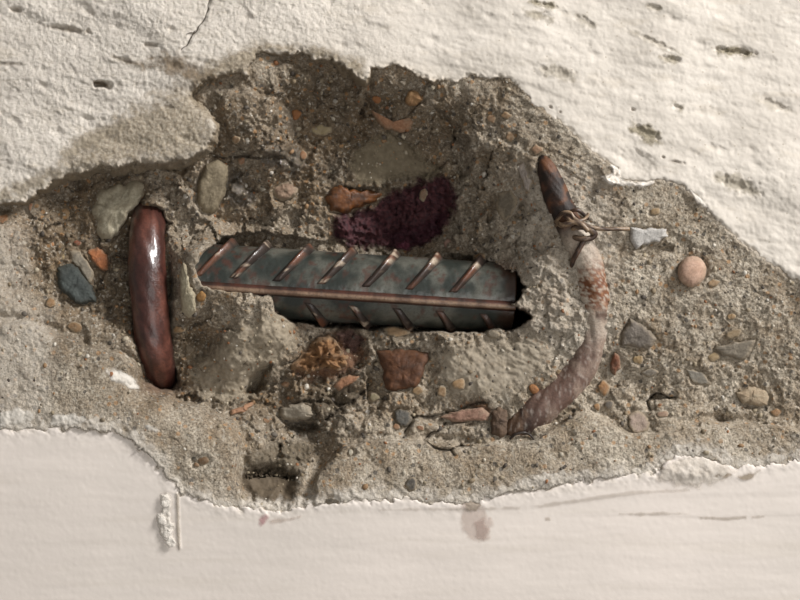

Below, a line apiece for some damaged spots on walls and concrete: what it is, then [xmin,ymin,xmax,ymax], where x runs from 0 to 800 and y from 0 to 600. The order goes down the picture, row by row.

spalling [0,46,800,513]
corrosion [512,310,530,326]